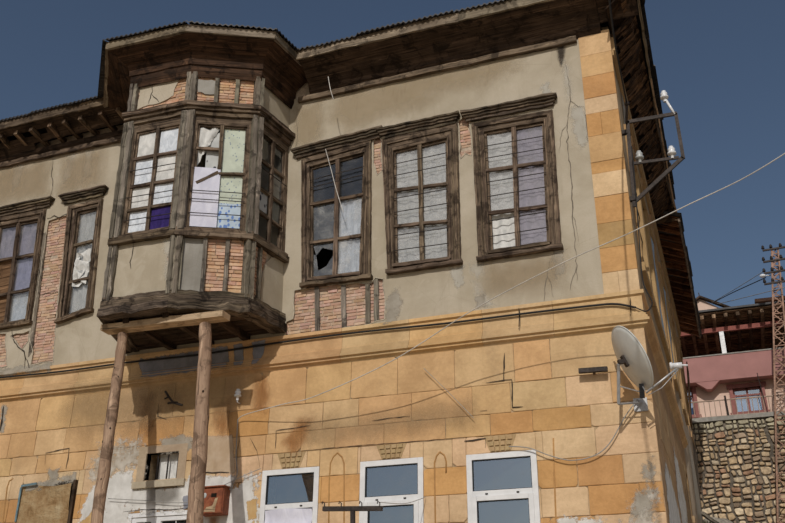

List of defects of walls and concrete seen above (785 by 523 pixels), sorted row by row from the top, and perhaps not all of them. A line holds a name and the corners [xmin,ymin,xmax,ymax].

crack [544,65,588,299]
spalling [0,215,67,368]
spalling [284,277,386,335]
crack [487,353,523,408]
crack [0,405,8,432]
peeling [78,449,101,523]
peeling [103,438,190,523]
peeling [203,435,261,523]
peeling [557,515,603,523]
peeling [620,451,688,523]